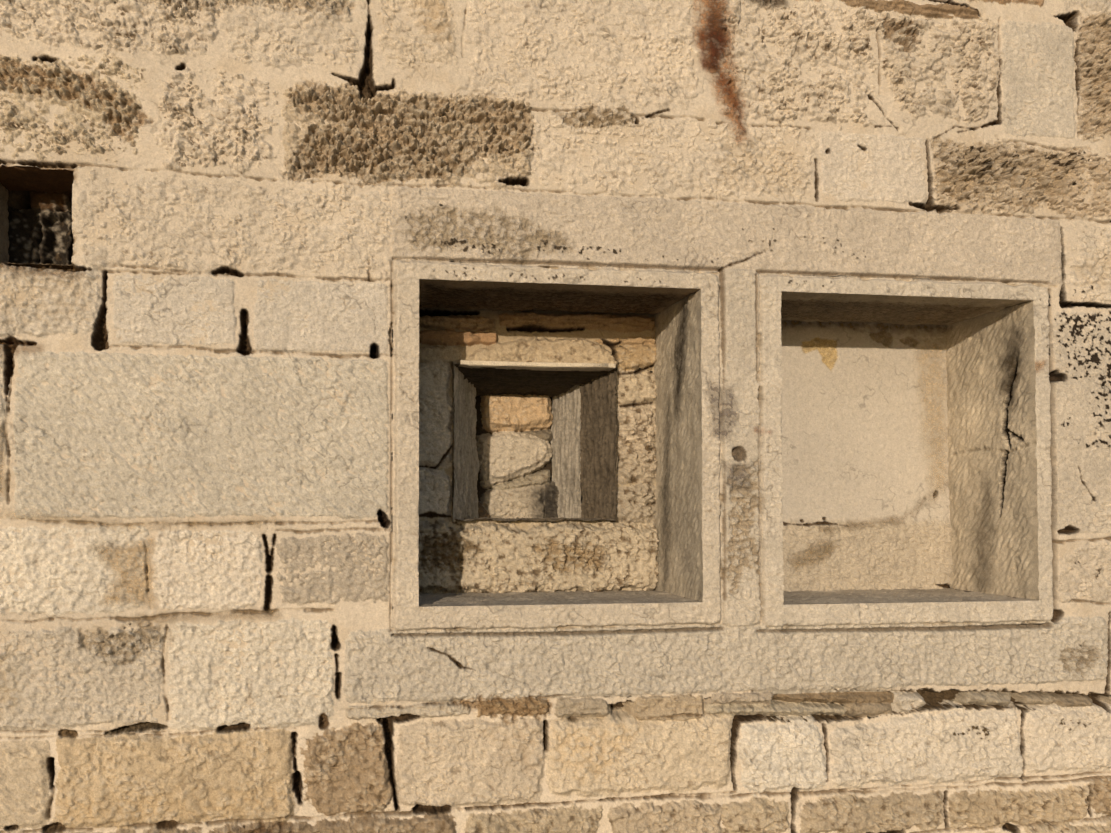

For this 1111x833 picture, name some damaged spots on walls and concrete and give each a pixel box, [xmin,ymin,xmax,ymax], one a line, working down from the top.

corrosion [695,0,744,140]
crack [998,371,1024,518]